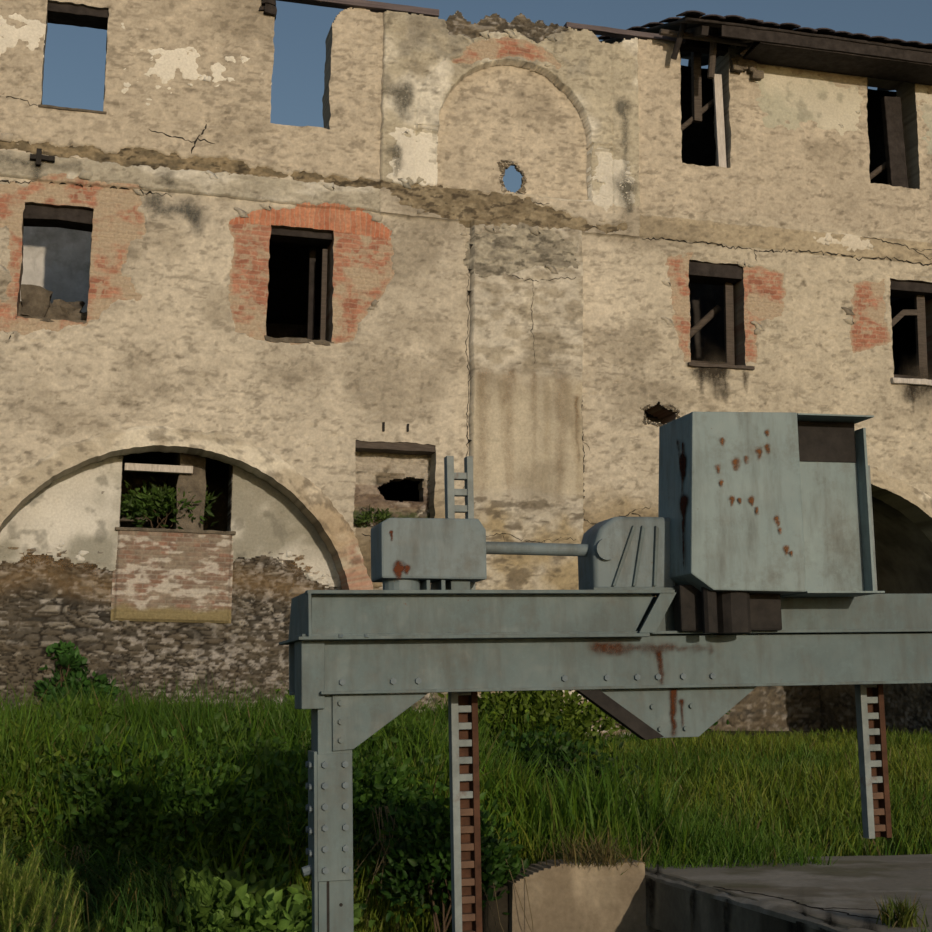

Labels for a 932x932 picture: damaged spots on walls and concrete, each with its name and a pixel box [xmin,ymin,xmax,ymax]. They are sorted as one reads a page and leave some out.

peeling [121,47,250,94]
crack [149,124,215,154]
flaking render [0,123,640,345]
crack [465,244,480,456]
crack [503,274,576,363]
flaking render [661,252,693,362]
leakage [694,357,726,387]
flaking render [737,259,786,363]
rust [732,430,770,470]
rust [677,441,688,566]
rust [651,646,674,681]
rust [670,688,684,734]